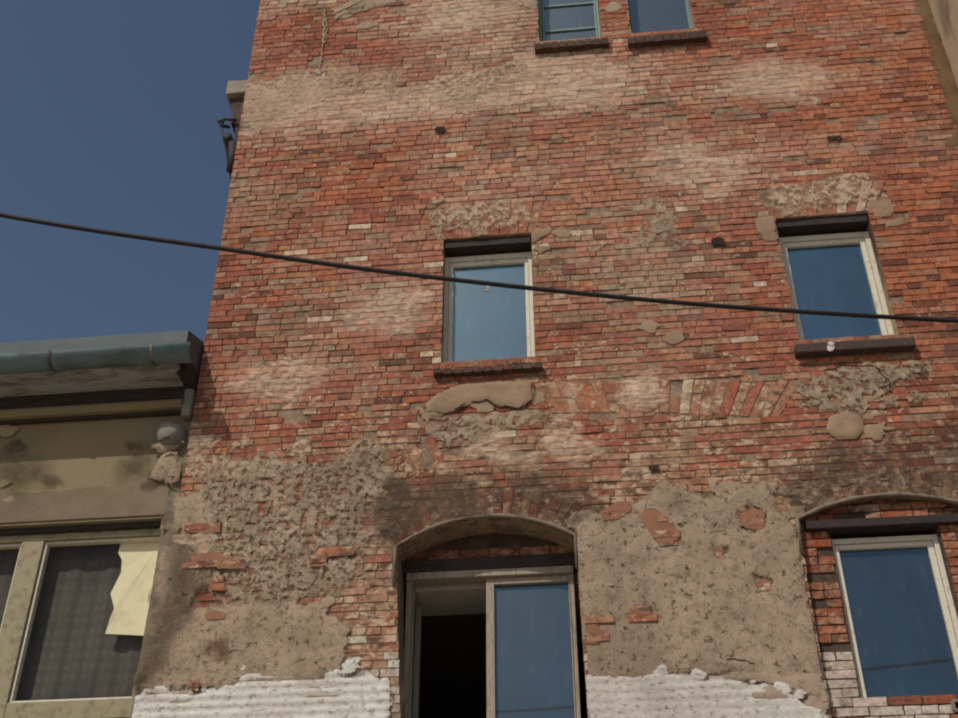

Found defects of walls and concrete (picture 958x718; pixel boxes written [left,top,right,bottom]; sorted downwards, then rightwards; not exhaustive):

crack [319,0,363,68]
flaking render [333,0,408,29]
flaking render [606,1,622,12]
spalling [0,425,19,437]
flaking render [0,434,399,718]
flaking render [564,465,829,718]